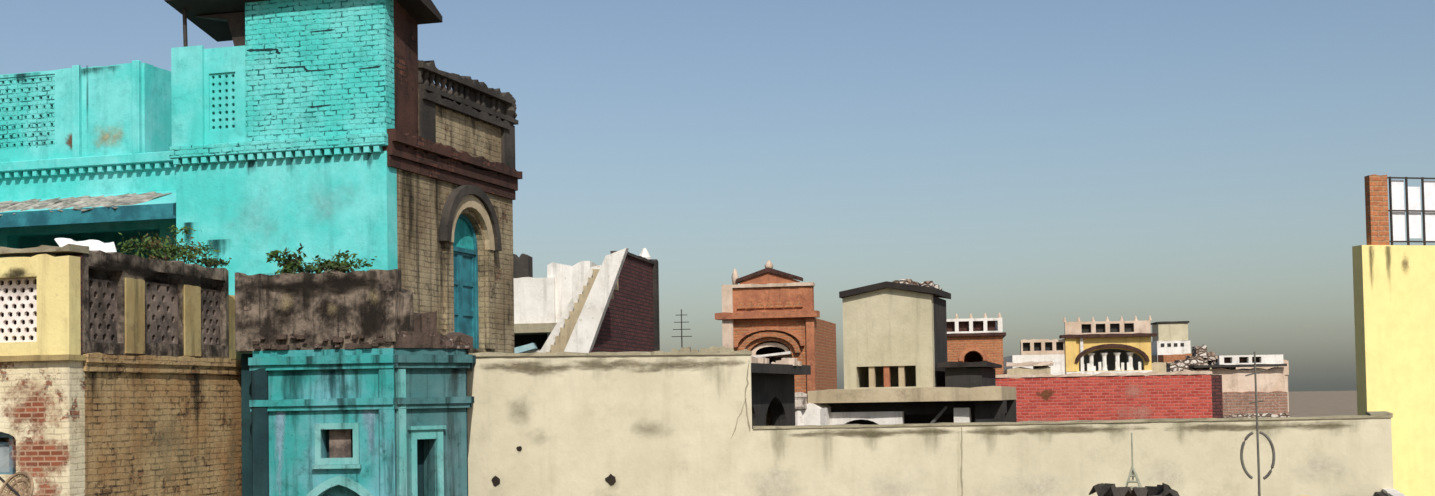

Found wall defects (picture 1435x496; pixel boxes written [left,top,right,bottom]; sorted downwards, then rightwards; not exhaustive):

spalling [5,383,70,496]
crack [731,364,750,438]